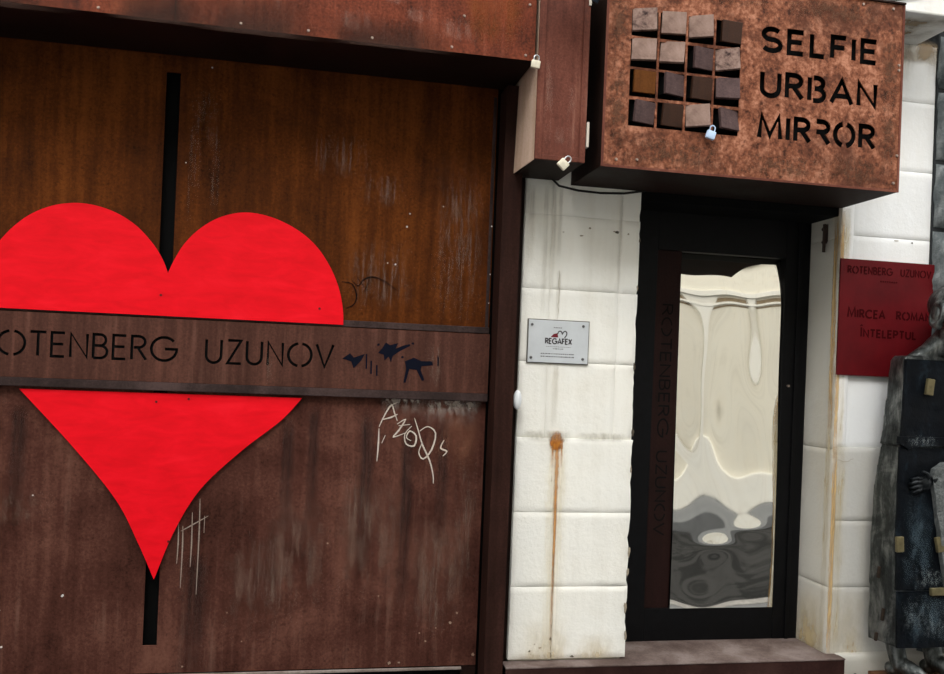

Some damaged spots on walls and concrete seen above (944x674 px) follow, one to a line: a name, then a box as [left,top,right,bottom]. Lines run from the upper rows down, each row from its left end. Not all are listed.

rust [550,432,563,604]